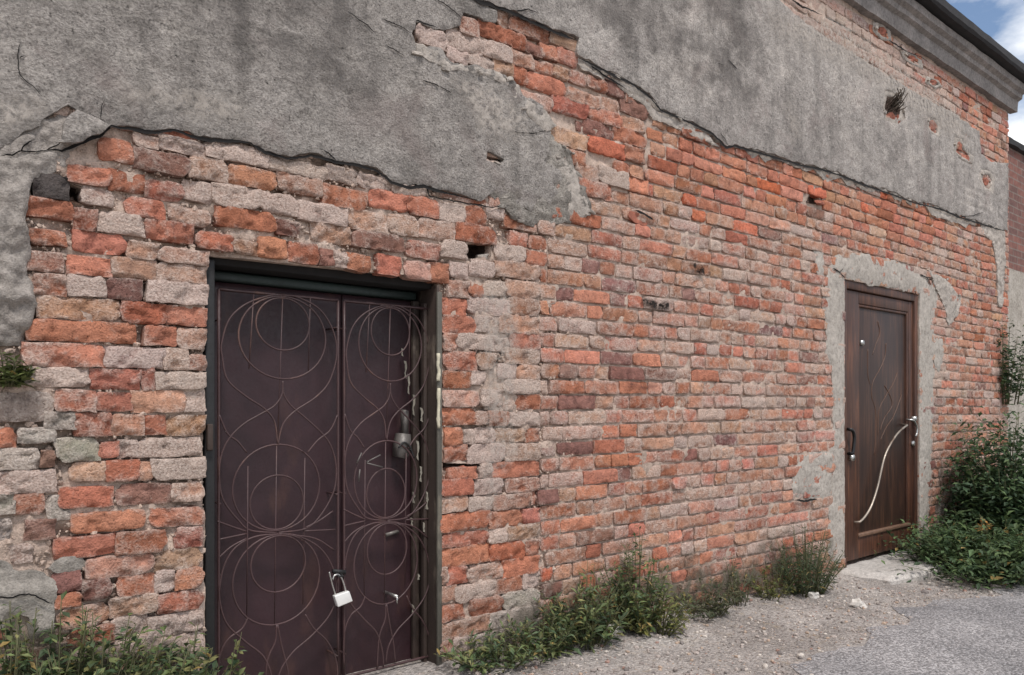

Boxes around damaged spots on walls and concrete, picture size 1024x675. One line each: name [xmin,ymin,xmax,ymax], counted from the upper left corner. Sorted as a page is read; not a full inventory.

crack [17,43,42,96]
peeling [57,110,110,146]
crack [2,99,499,208]
peeling [411,43,596,227]
peeling [577,57,720,147]
crack [349,0,1007,232]
spalling [883,88,908,124]
hole [69,183,81,204]
hole [467,244,492,259]
peeling [734,147,1007,307]
peeling [401,348,423,422]
peeling [412,441,429,509]